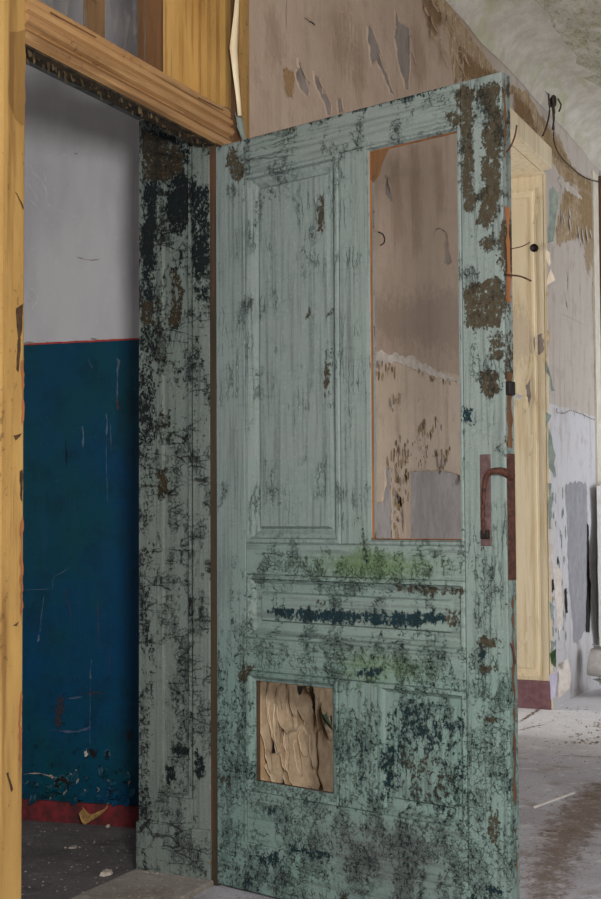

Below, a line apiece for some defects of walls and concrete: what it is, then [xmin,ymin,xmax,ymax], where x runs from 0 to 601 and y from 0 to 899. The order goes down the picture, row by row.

peeling [294,58,345,116]
peeling [366,10,417,97]
damp [423,0,441,36]
flaking render [424,0,500,83]
damp [459,47,489,79]
damp [514,92,536,132]
flaking render [510,83,592,248]
peeling [6,691,135,807]